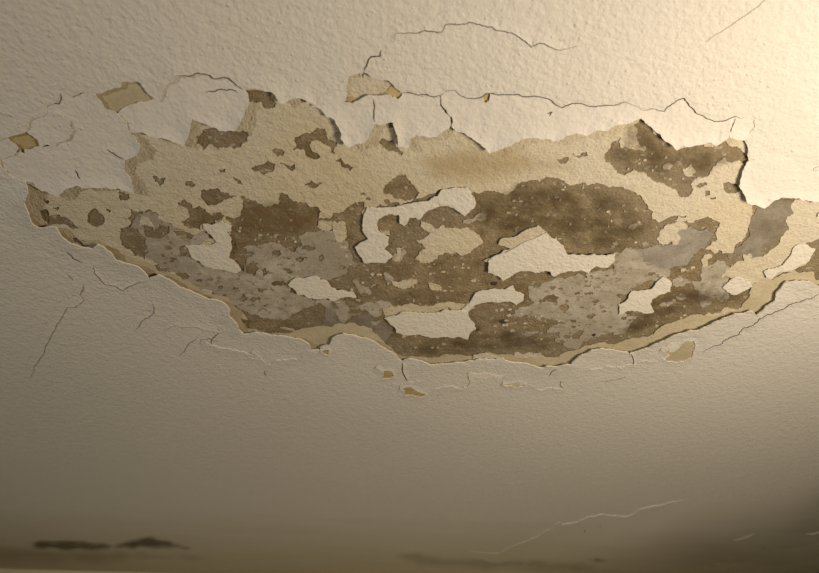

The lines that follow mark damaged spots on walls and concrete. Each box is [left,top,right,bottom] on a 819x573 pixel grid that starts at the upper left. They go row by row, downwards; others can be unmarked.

crack [362,9,582,77]
peeling [0,72,819,403]